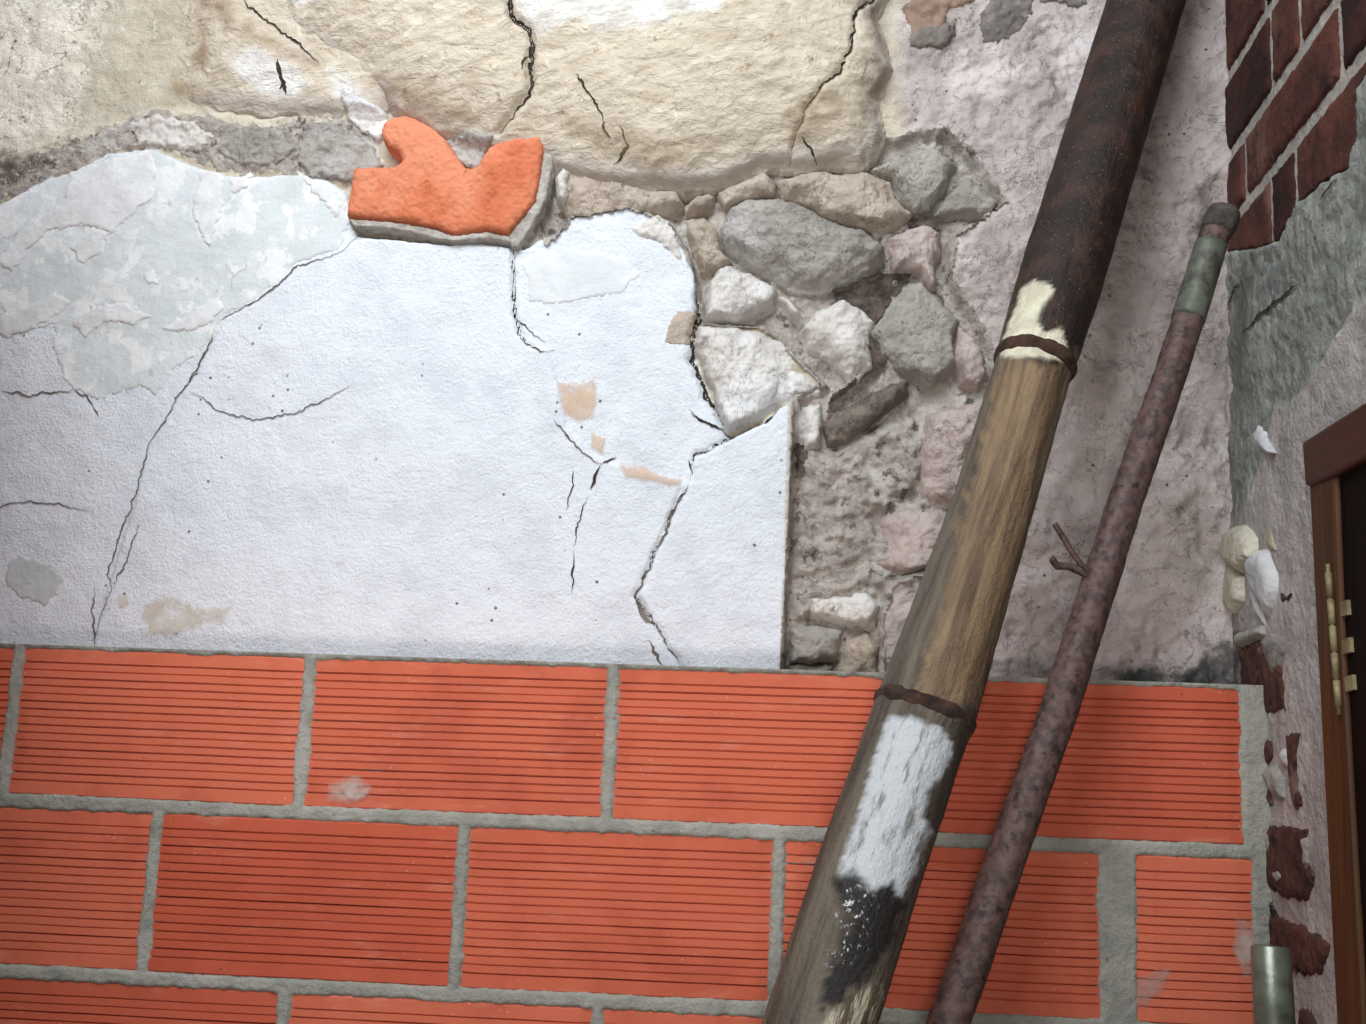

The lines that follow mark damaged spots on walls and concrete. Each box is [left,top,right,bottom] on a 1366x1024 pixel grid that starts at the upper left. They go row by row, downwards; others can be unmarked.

crack [244,0,314,94]
crack [500,0,535,134]
crack [789,0,875,167]
spalling [901,0,1087,50]
flaking render [1224,0,1366,252]
peeling [0,87,388,400]
crack [91,236,360,642]
crack [555,422,616,594]
crack [634,297,789,665]
spalling [538,126,1009,673]
spalling [1264,825,1315,902]
spalling [1269,913,1331,977]